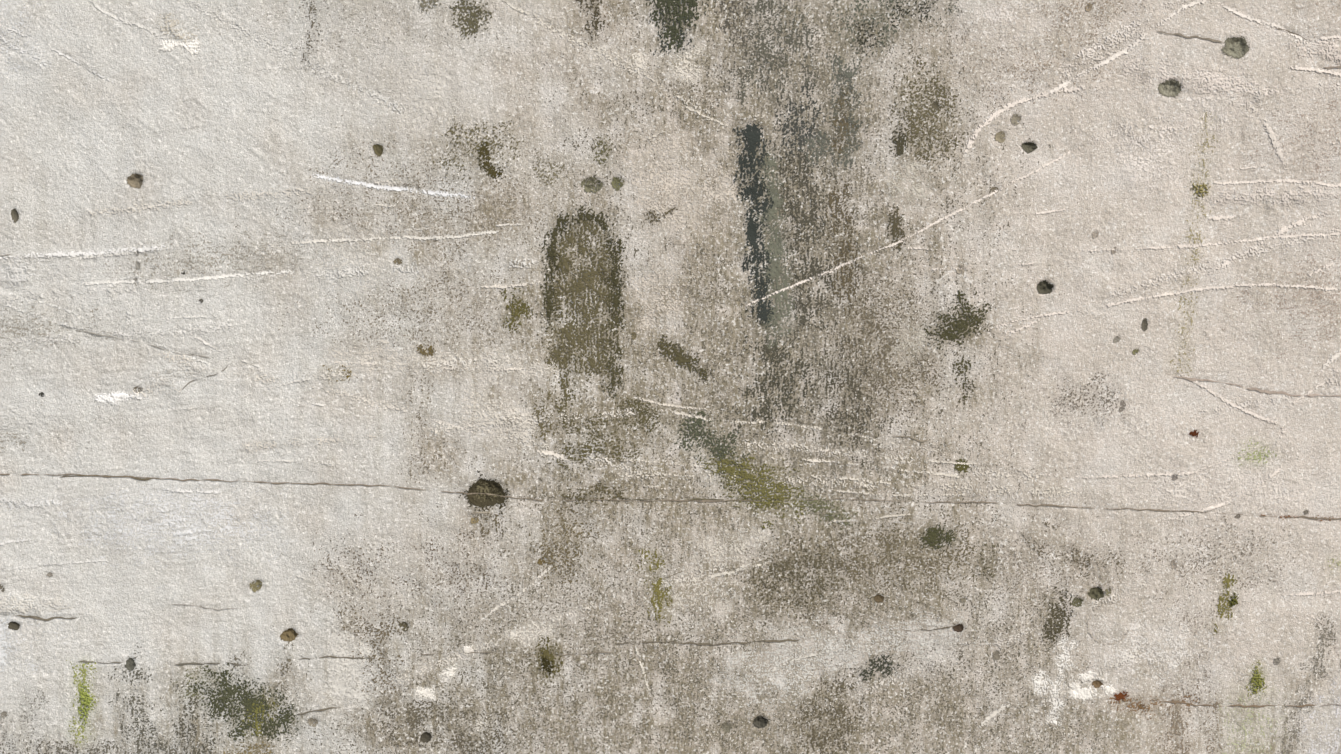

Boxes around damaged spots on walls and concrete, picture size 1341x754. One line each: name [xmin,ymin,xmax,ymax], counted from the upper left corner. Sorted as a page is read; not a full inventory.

mould [416,344,436,357]
water stain [496,205,664,587]
water stain [630,0,1331,754]
crack [62,474,153,482]
water stain [302,374,519,754]
crack [16,614,75,622]
water stain [276,642,297,694]
mould [524,634,564,685]
water stain [0,646,275,754]